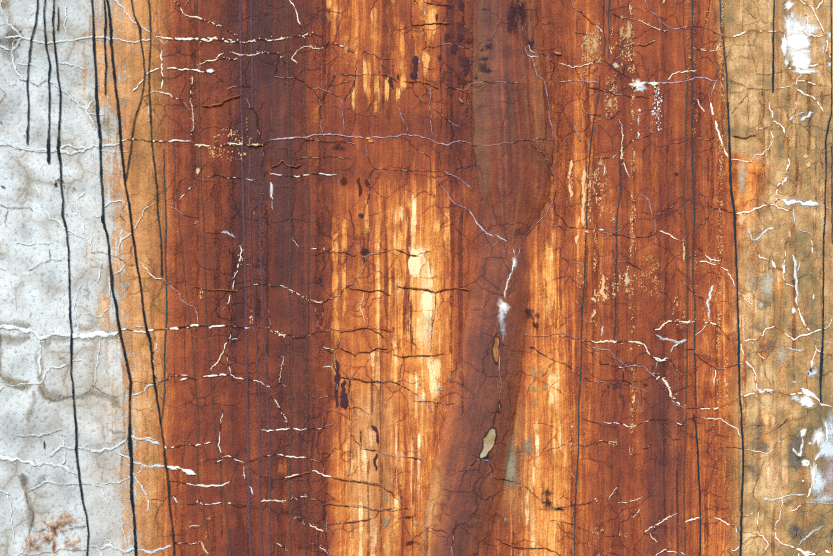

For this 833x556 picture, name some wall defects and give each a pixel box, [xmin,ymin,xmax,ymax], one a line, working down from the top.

water stain [0,31,22,57]
crack [0,0,833,436]
rust [82,0,482,556]
rust [486,0,833,556]
water stain [0,322,30,342]
water stain [2,358,119,408]
crack [0,186,469,556]
spalling [491,332,500,364]
spalling [478,426,497,460]
crack [460,459,642,537]
crack [644,513,685,555]